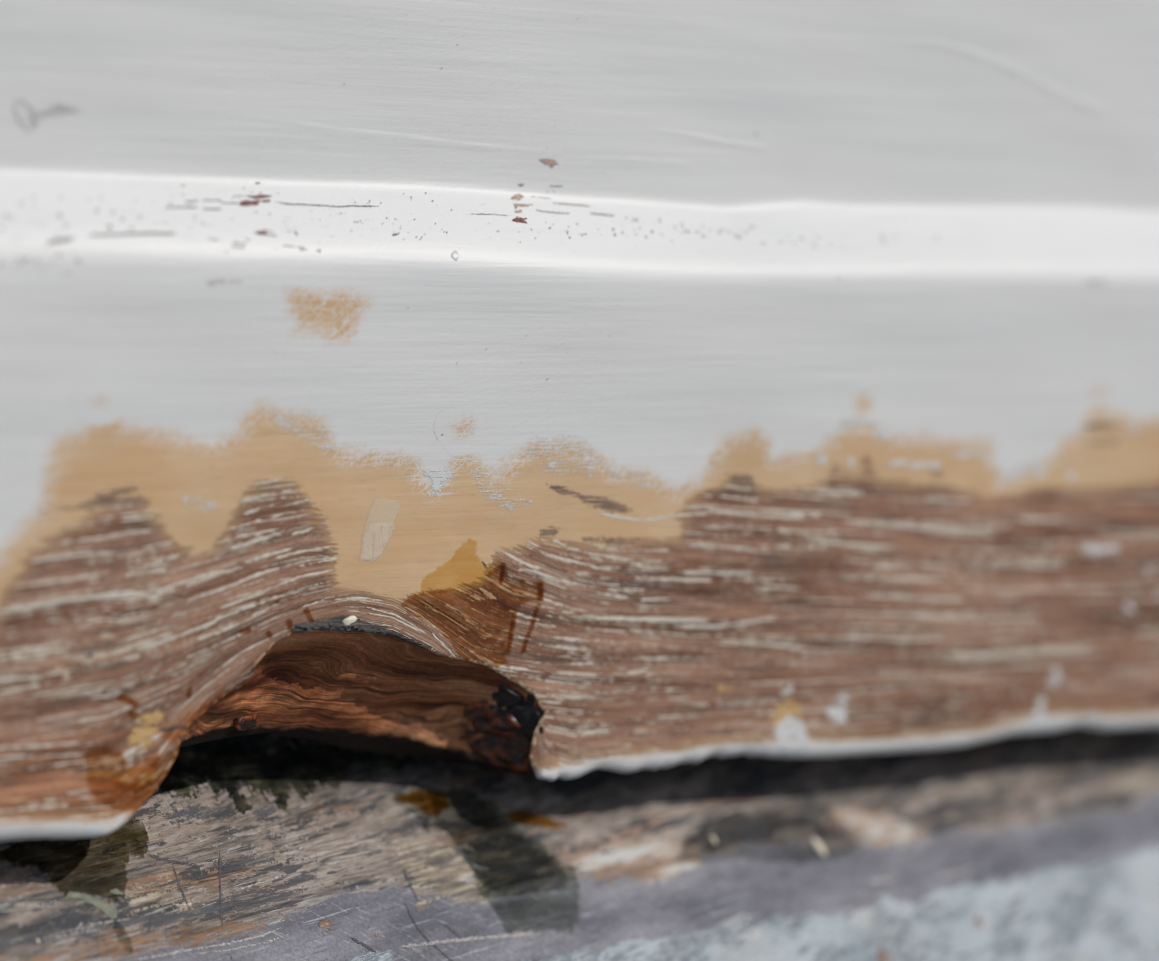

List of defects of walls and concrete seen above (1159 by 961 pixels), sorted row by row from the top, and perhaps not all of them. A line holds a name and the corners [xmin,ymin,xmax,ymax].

peeling [261,250,391,370]
peeling [0,367,1159,961]